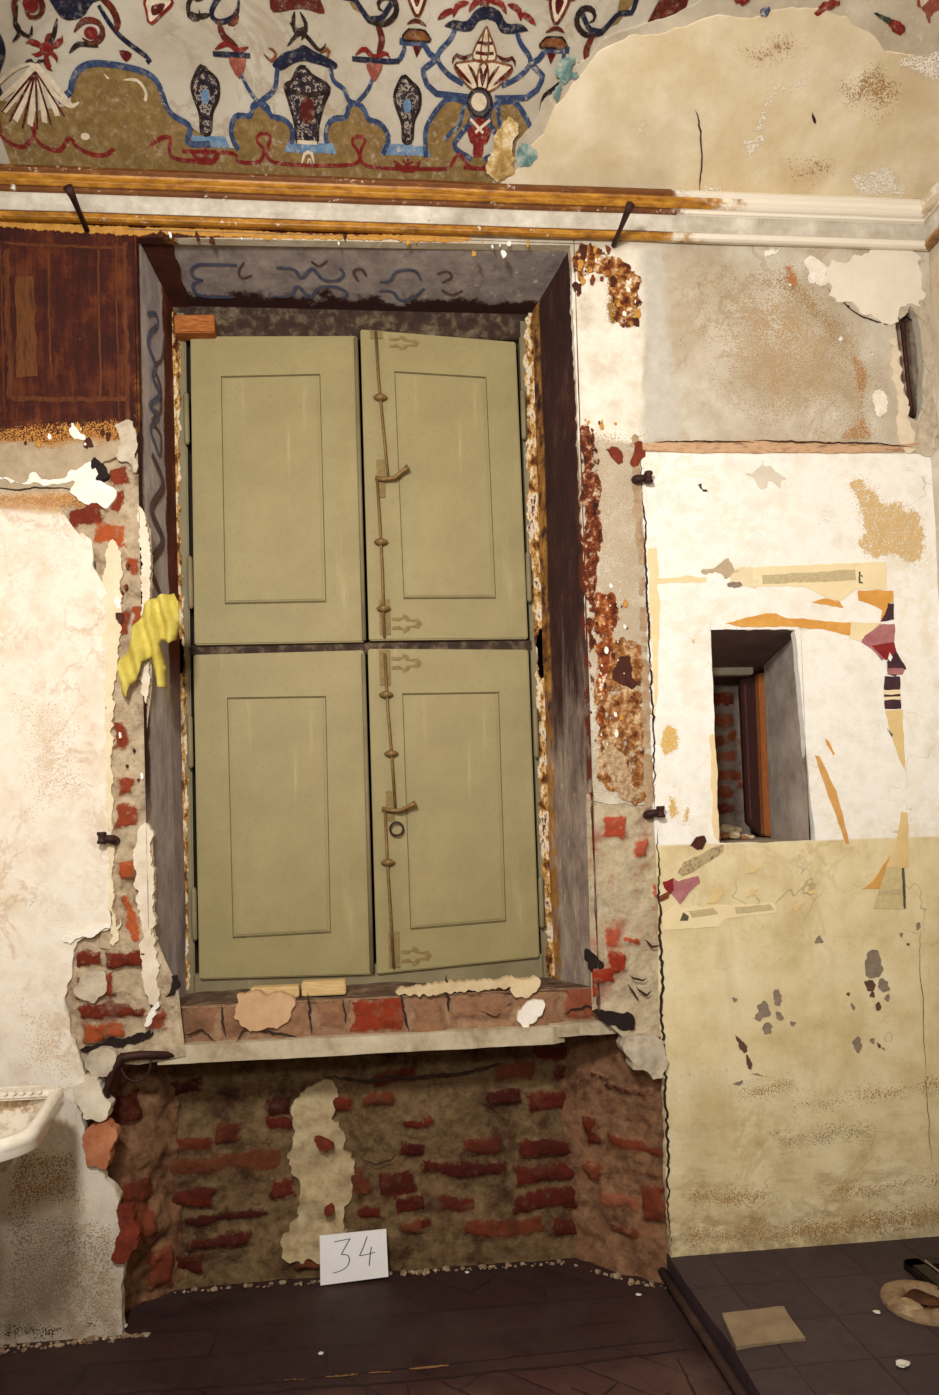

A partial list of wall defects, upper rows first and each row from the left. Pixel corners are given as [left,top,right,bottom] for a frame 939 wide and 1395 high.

flaking render [486,0,939,199]
crack [695,110,703,190]
peeling [572,243,642,328]
peeling [803,255,828,287]
flaking render [0,311,191,1169]
flaking render [111,1202,144,1264]